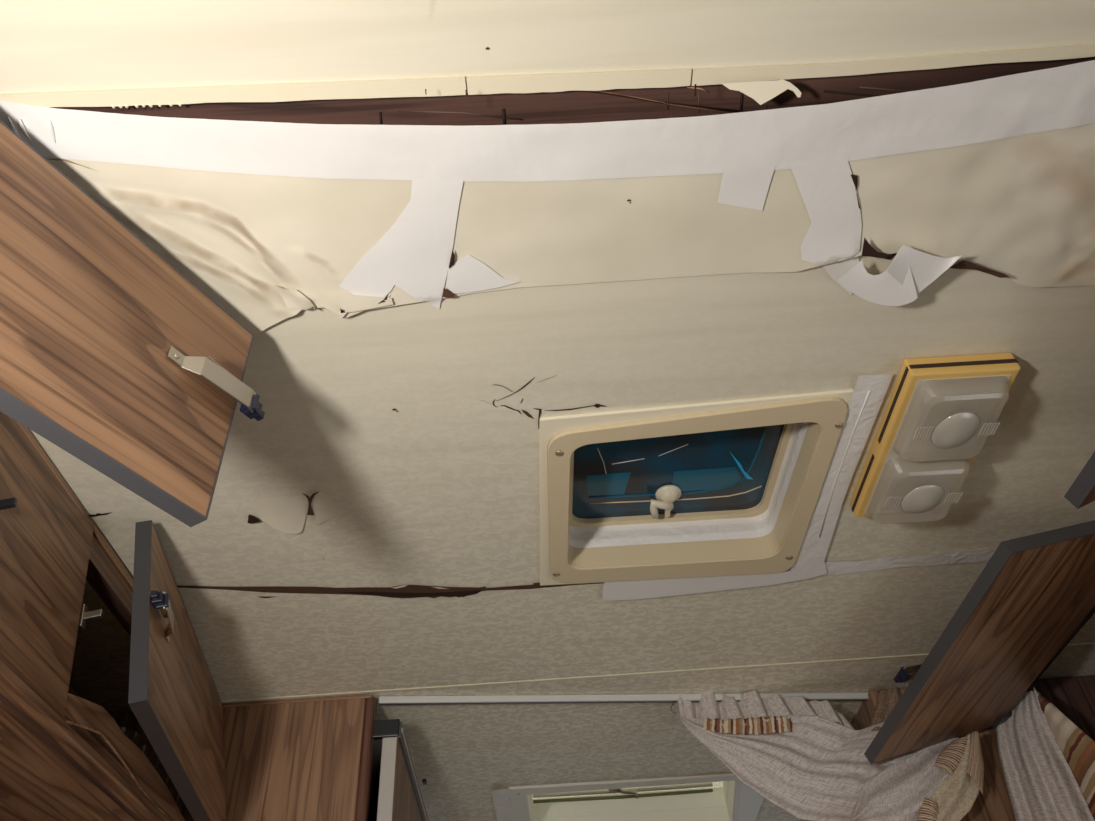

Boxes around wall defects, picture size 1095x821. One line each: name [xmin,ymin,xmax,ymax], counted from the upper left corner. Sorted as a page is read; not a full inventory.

peeling [723,80,801,105]
crack [487,375,606,429]
crack [177,582,601,601]